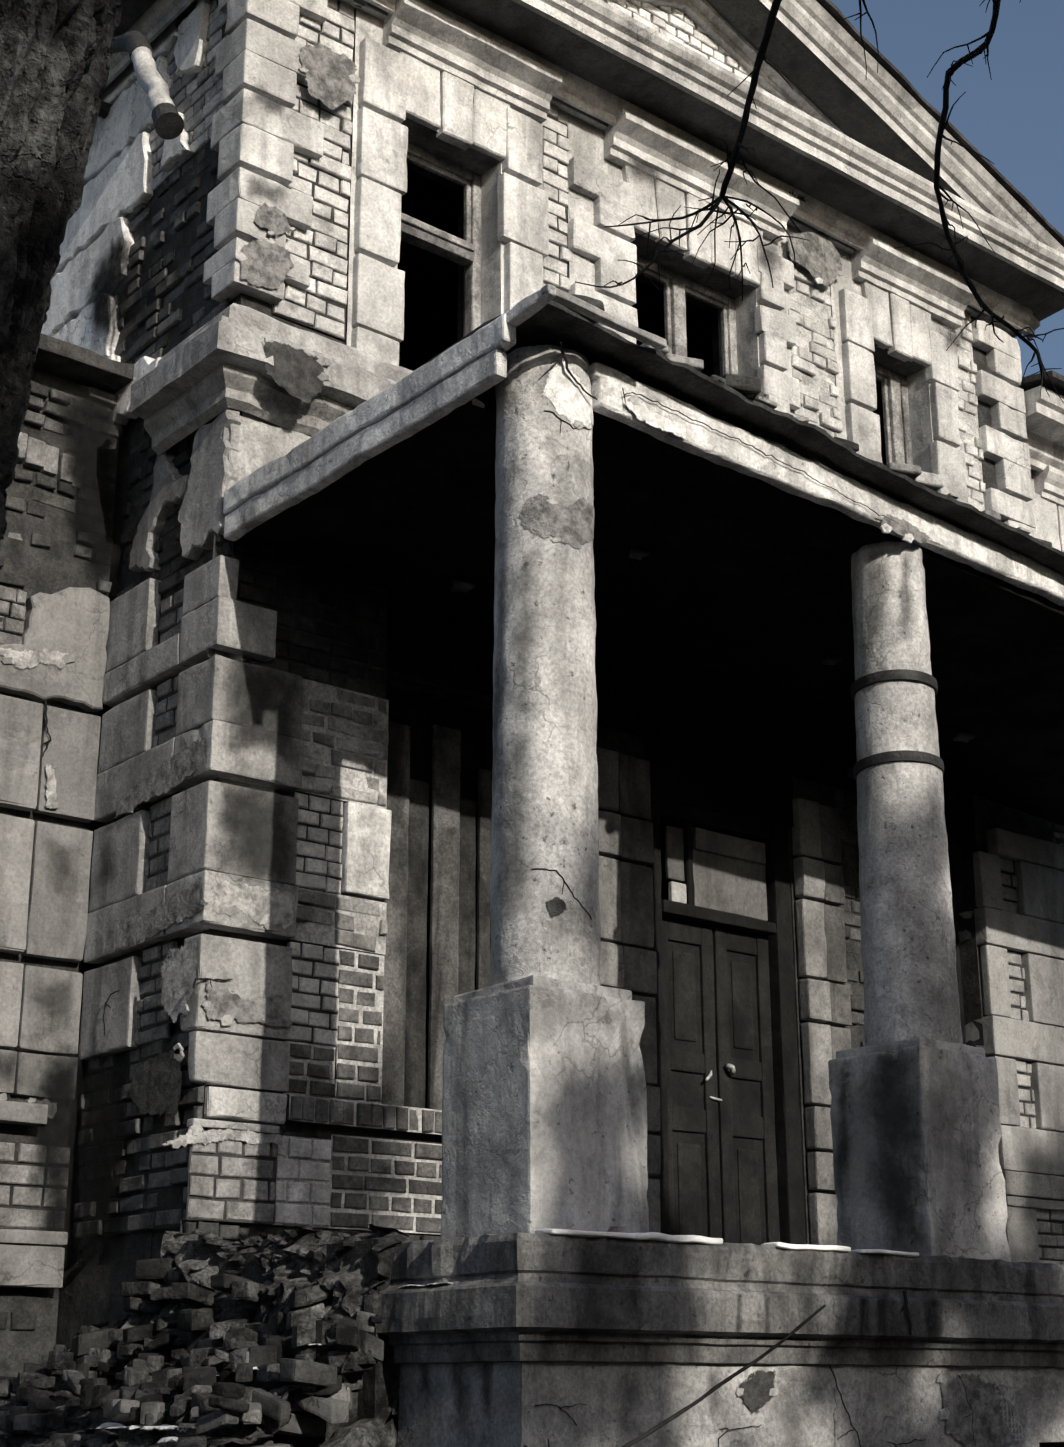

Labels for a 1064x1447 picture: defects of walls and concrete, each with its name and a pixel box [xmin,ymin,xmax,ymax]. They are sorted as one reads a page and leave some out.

spalling [298,42,360,109]
spalling [264,338,330,404]
crack [544,342,897,523]
spalling [519,494,595,549]
water stain [230,660,299,762]
water stain [223,788,293,879]
flaking render [113,876,296,950]
crack [532,868,592,920]
spalling [161,936,294,1031]
flaking render [162,1124,283,1149]
spalling [0,1239,402,1447]
spalling [735,1370,779,1414]